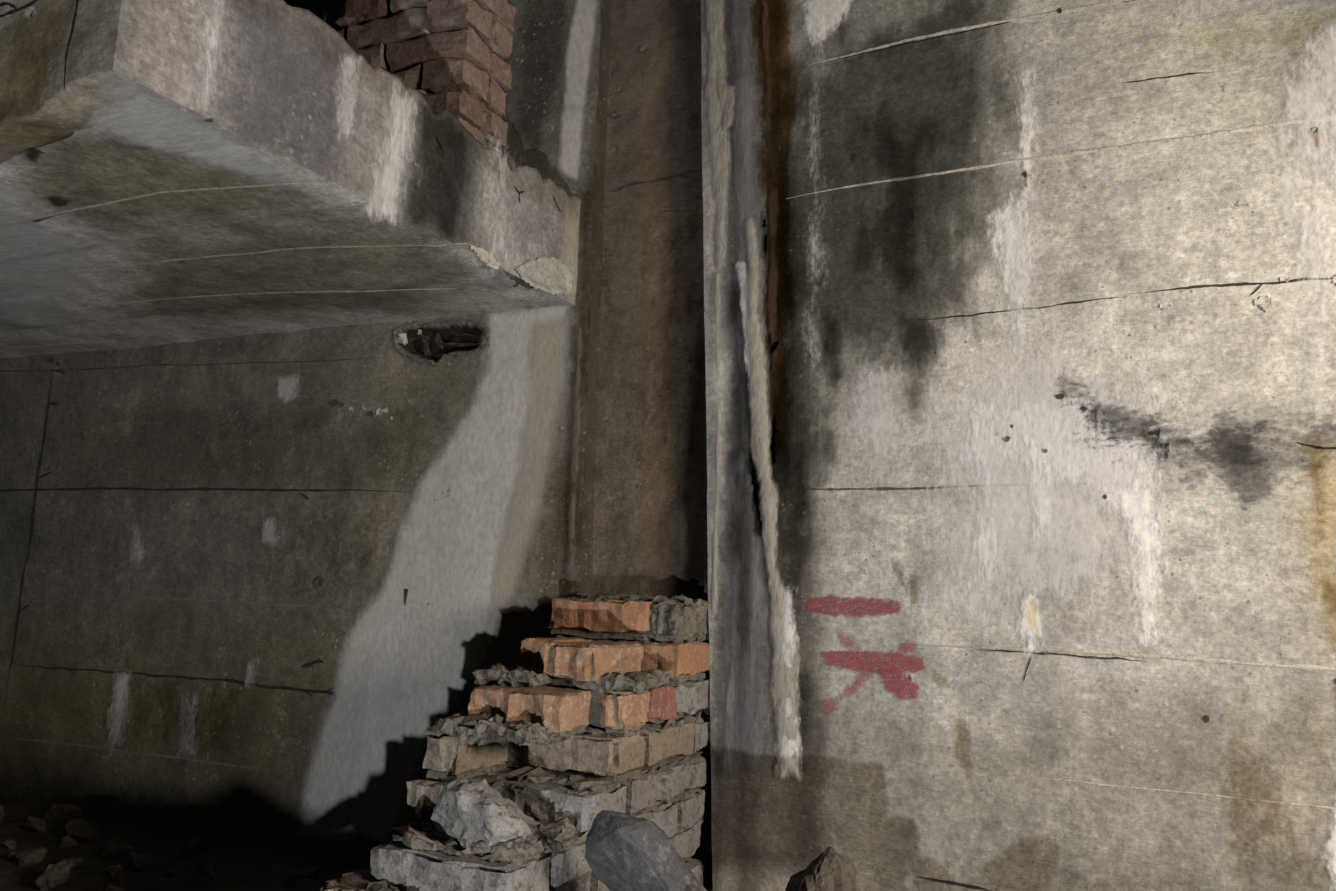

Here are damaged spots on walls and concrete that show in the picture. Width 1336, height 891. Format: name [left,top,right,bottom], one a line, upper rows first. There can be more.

crack [0,0,38,17]
crack [64,0,78,88]
efflorescence [804,0,850,44]
water stain [93,81,291,180]
efflorescence [369,89,416,219]
efflorescence [988,70,1038,344]
crack [923,277,1333,320]
hole [392,319,490,367]
crack [977,649,1148,680]
efflorescence [1328,804,1336,888]